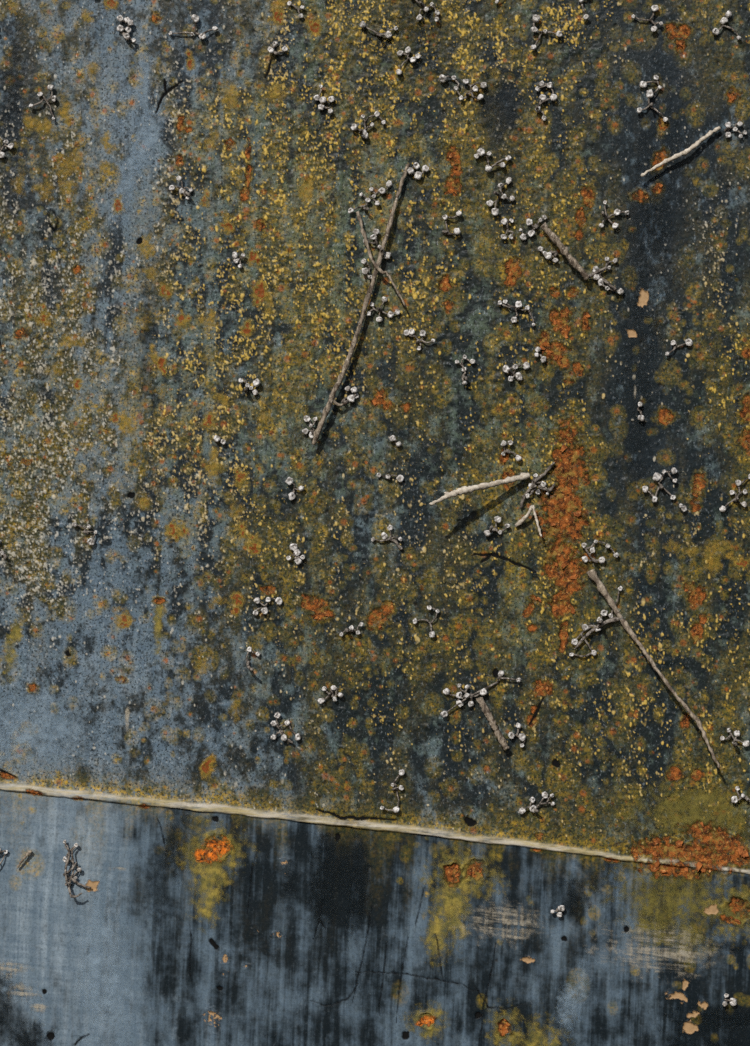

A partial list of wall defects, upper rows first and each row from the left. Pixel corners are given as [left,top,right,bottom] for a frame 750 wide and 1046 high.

corrosion [522,418,590,653]
corrosion [301,594,335,623]
corrosion [368,601,394,631]
corrosion [666,766,702,781]
corrosion [188,820,240,919]
corrosion [427,848,495,953]
corrosion [604,822,750,963]
corrosion [494,1013,559,1046]